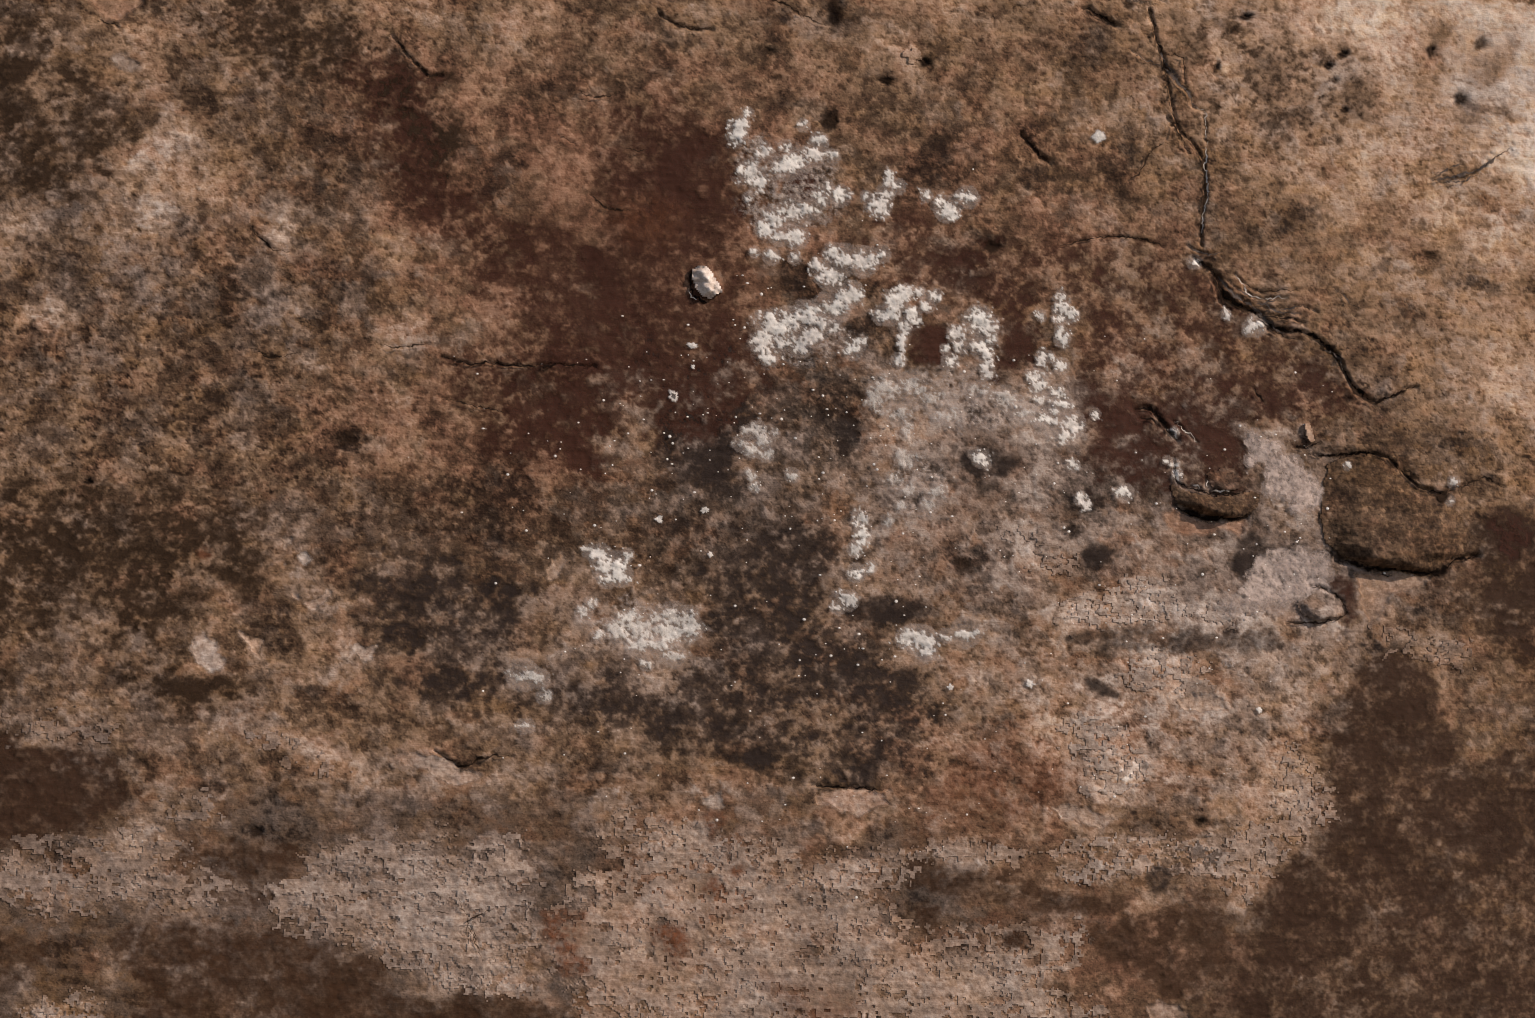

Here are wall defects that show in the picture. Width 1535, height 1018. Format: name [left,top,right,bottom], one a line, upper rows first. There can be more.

damp [190,0,1376,513]
crack [1060,0,1411,404]
damp [351,510,980,789]
damp [884,451,946,524]
damp [1083,544,1112,570]
damp [1067,628,1283,655]
damp [1229,531,1357,623]
damp [1456,506,1535,666]
damp [906,653,1535,1018]